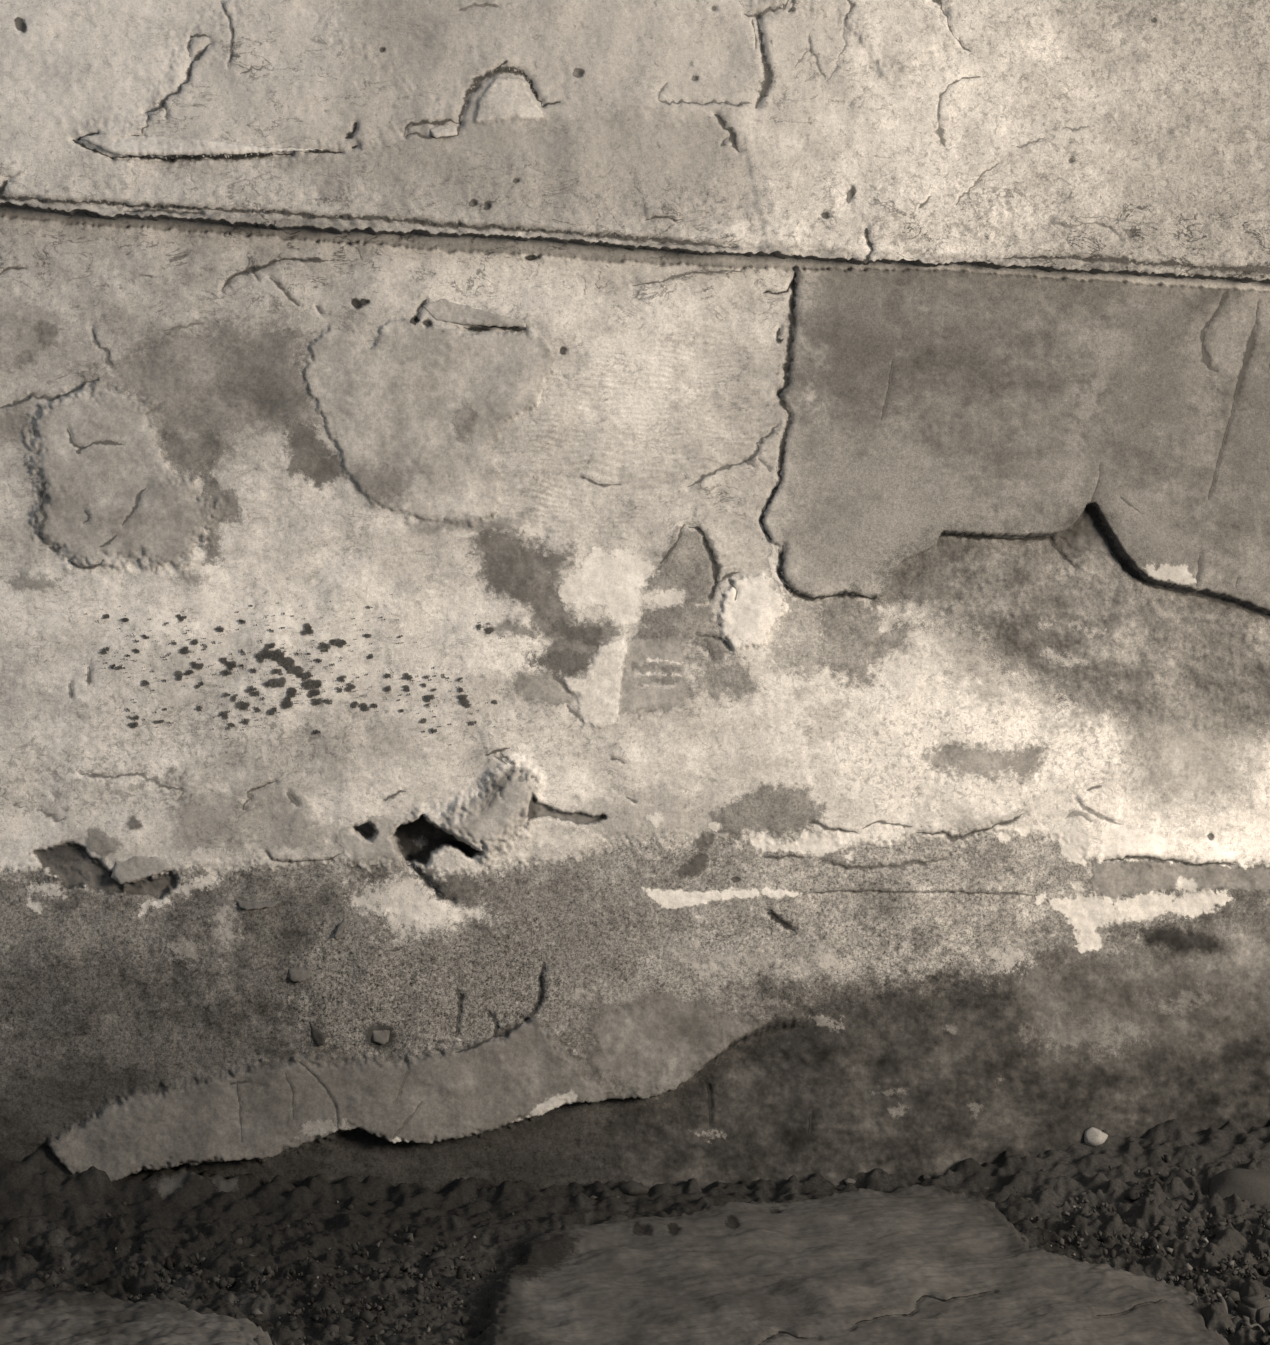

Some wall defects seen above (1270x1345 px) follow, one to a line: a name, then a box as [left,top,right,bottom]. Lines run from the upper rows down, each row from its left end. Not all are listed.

flaking render [81,133,322,156]
crack [659,0,855,152]
crack [933,0,986,146]
damp [78,317,407,585]
crack [0,180,873,602]
flaking render [758,258,1270,748]
damp [84,511,685,745]
flaking render [33,828,176,901]
flaking render [337,815,480,907]
damp [333,806,615,950]
damp [590,816,1270,1190]
flaking render [48,1013,614,1182]